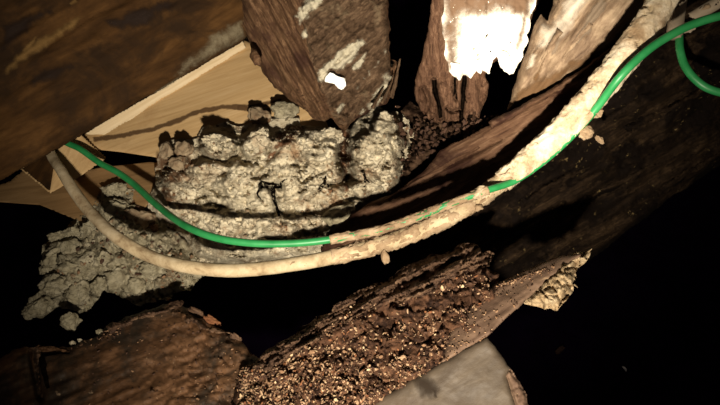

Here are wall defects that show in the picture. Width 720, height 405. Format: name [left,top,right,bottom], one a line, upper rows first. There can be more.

crack [256,179,287,217]